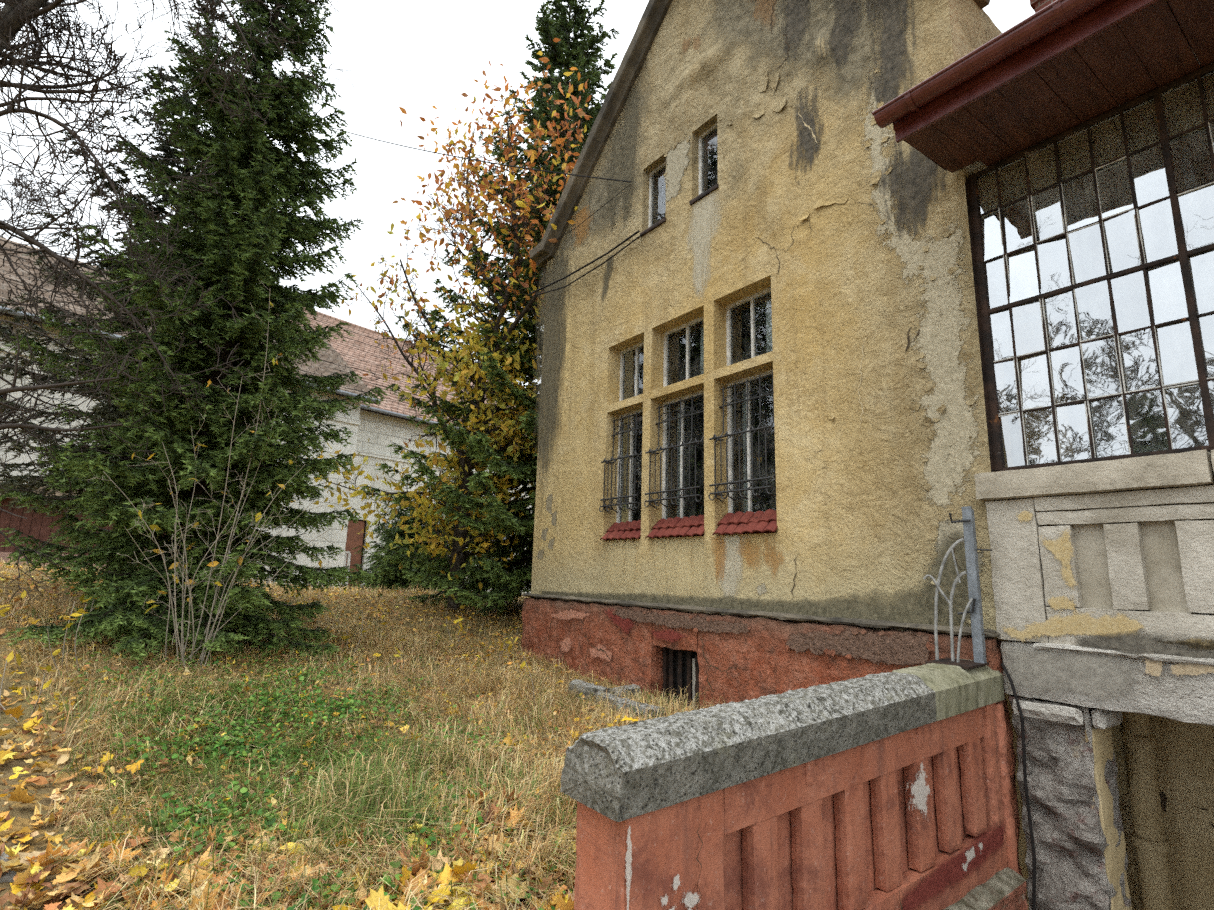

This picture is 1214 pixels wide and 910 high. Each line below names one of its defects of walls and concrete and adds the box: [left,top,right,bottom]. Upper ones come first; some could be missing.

leakage [780,0,810,57]
leakage [829,0,914,105]
leakage [789,93,823,167]
leakage [882,142,945,234]
crack [755,215,811,274]
flaking render [714,0,985,585]
leakage [542,534,971,634]
peeling [1003,531,1144,641]
flaking render [785,627,935,667]
peeling [1145,638,1214,677]
peeling [907,757,930,818]
peeling [661,874,700,910]